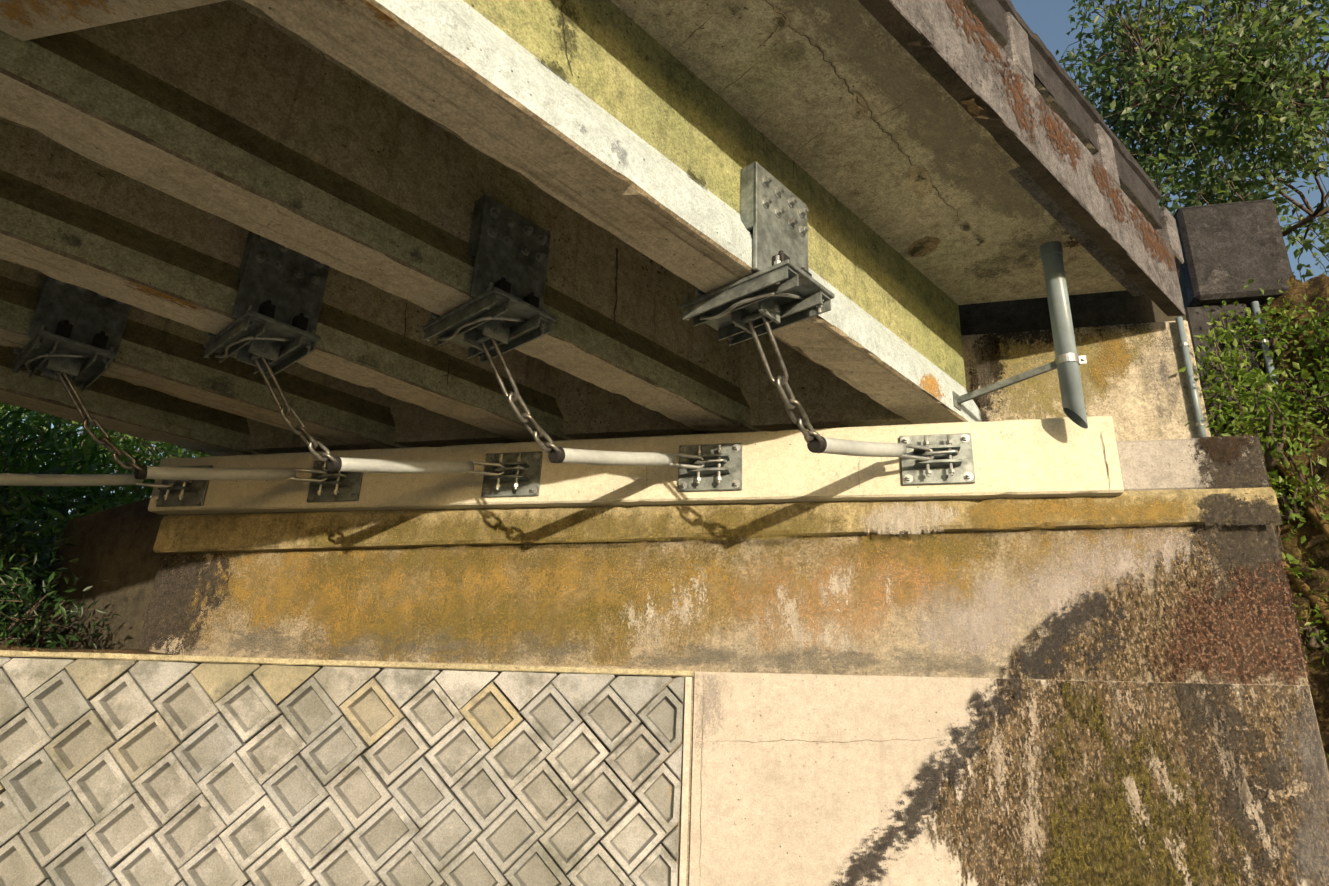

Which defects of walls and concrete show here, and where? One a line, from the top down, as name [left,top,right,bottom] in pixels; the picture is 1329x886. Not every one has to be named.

corrosion [0,0,115,27]
corrosion [336,0,398,28]
corrosion [919,373,946,404]
water stain [172,497,1210,727]
water stain [1255,778,1307,801]